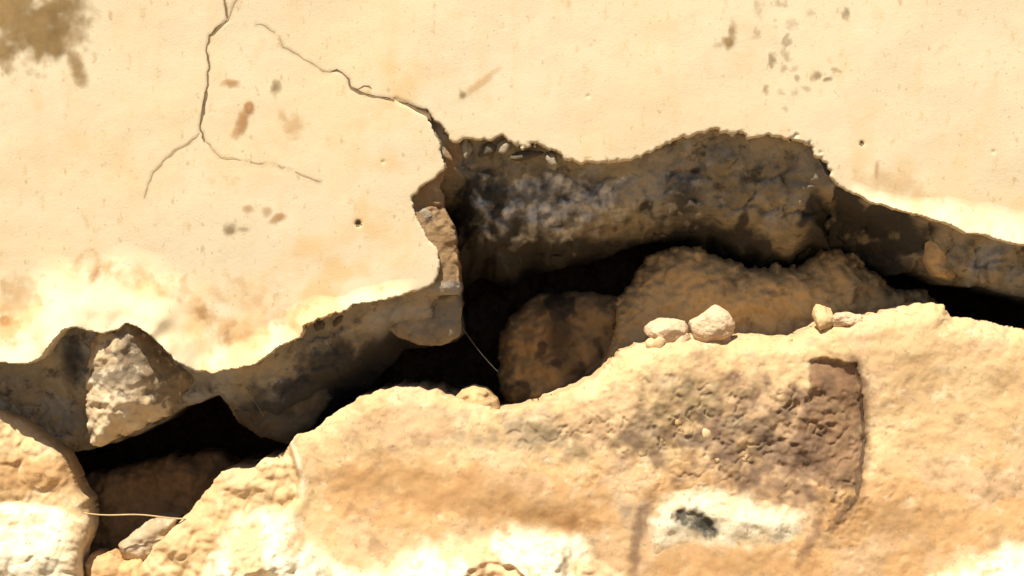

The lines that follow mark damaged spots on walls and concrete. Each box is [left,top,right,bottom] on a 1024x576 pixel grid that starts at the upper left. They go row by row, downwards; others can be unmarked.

water stain [0,0,84,78]
crack [144,0,320,197]
crack [261,24,431,121]
spalling [0,117,1024,576]